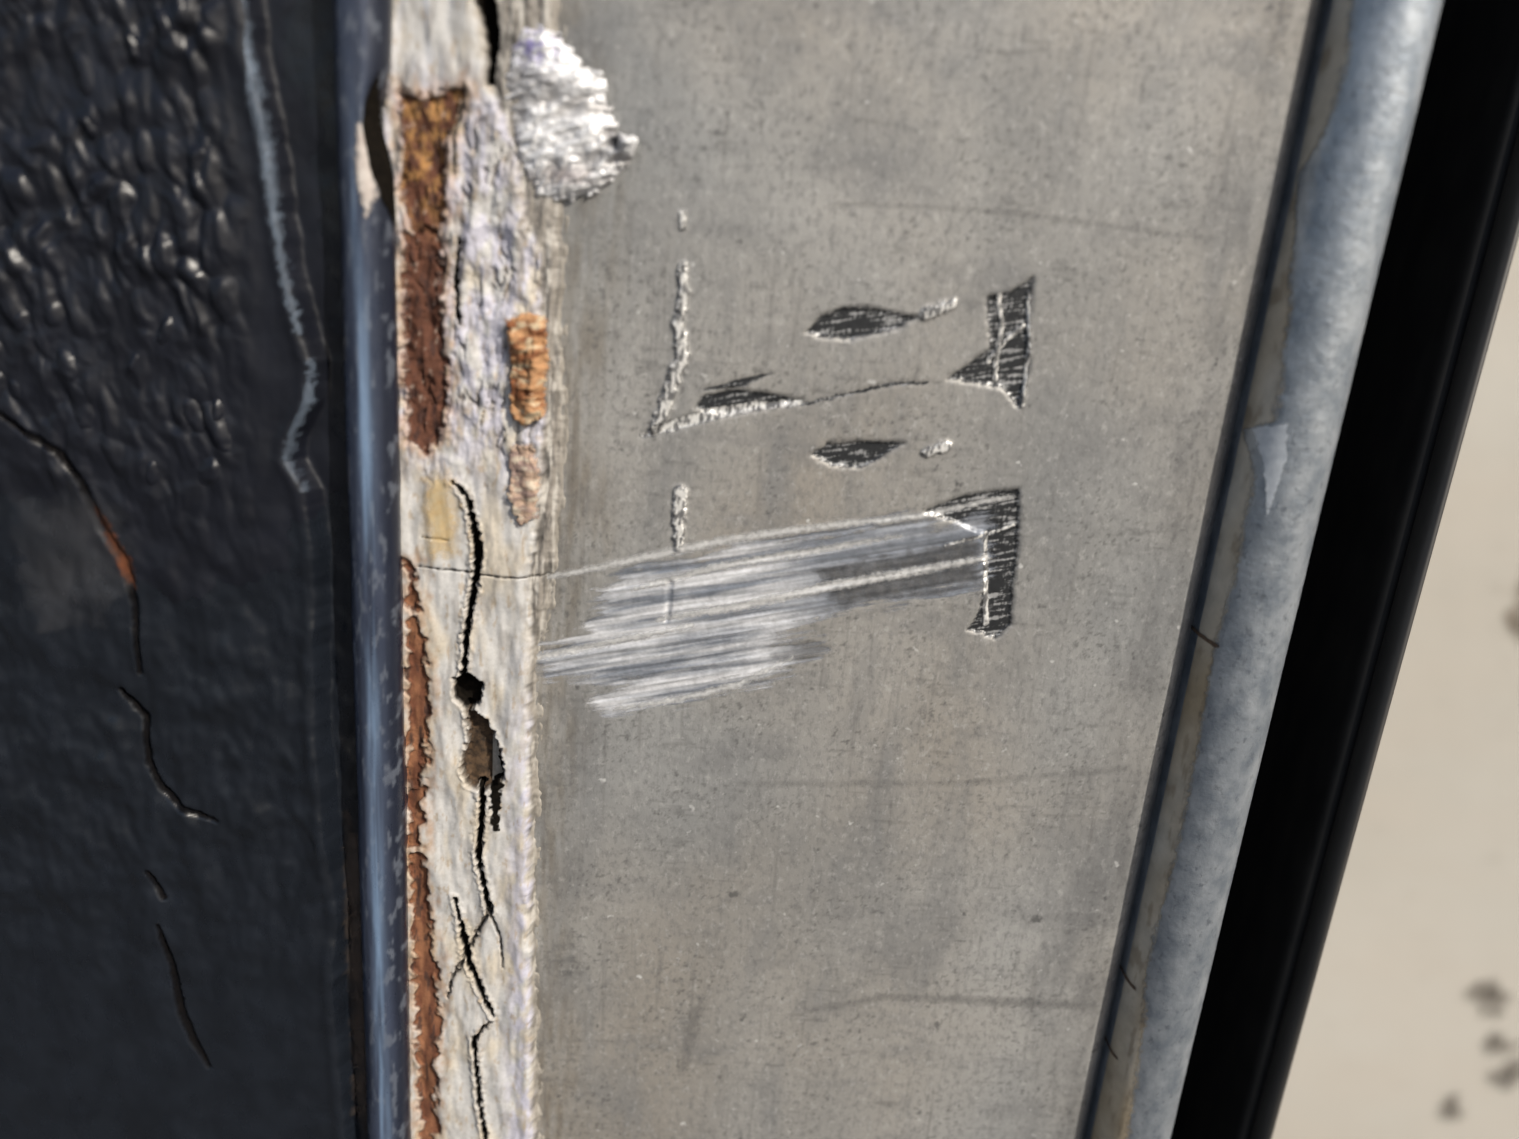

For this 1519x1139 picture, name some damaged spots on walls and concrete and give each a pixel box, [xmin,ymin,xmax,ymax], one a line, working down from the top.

crack [452,0,500,174]
corrosion [400,88,466,455]
crack [454,238,462,325]
crack [0,412,218,821]
corrosion [427,480,454,554]
crack [418,483,547,673]
corrosion [504,312,549,525]
peeling [1091,0,1352,1139]
corrosion [402,559,443,1139]
crack [146,871,211,1067]
crack [447,776,504,1139]